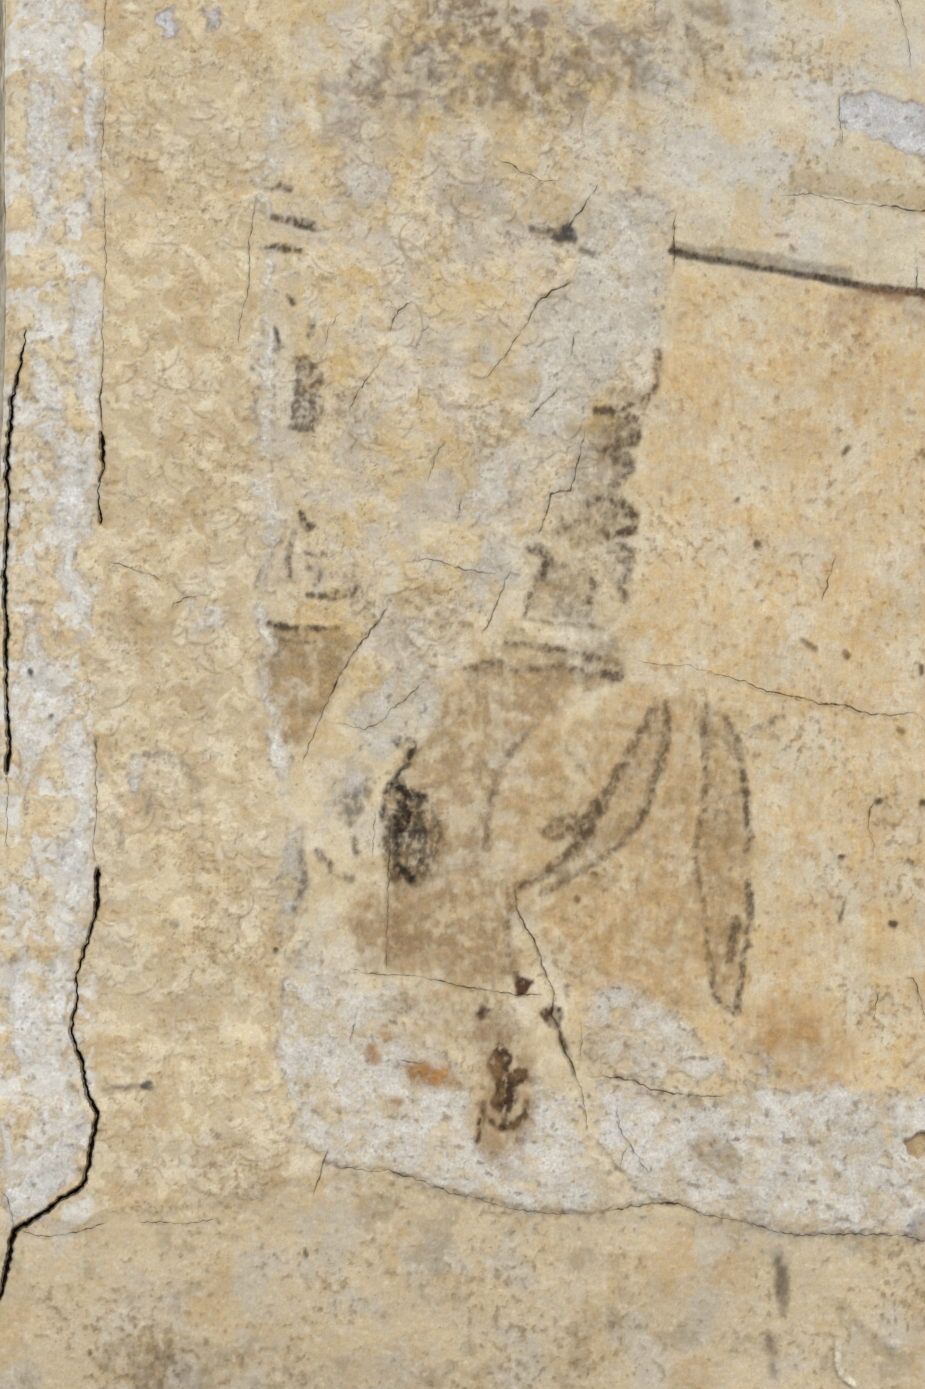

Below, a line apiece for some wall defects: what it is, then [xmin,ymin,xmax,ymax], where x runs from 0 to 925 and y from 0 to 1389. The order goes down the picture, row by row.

peeling [21,0,105,229]
peeling [839,91,925,157]
crack [3,330,27,845]
crack [97,206,107,524]
peeling [251,475,291,794]
peeling [325,653,439,817]
peeling [465,447,534,523]
peeling [521,193,670,436]
crack [0,742,104,1298]
crack [142,1217,212,1225]
flaking render [275,943,925,1239]
crack [355,821,920,1241]